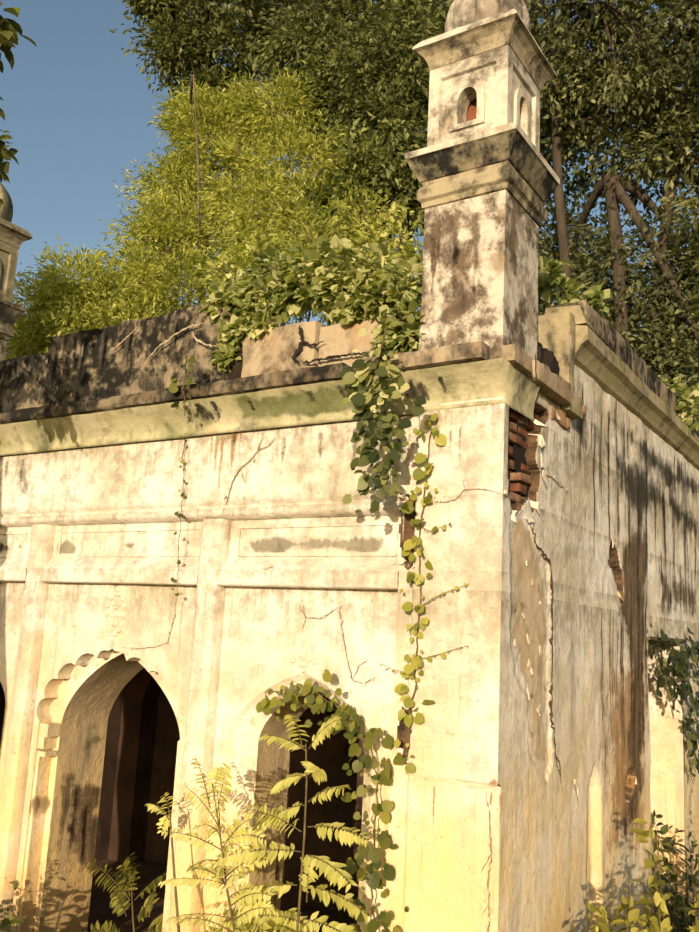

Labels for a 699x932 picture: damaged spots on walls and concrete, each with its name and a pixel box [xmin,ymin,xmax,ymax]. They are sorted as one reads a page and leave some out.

damp [430,212,480,308]
damp [138,375,161,392]
damp [183,401,220,420]
crack [291,326,371,366]
crack [223,437,276,514]
peeling [508,404,586,760]
crack [530,524,579,801]
damp [574,400,699,836]
damp [56,774,101,871]
crack [481,791,493,932]